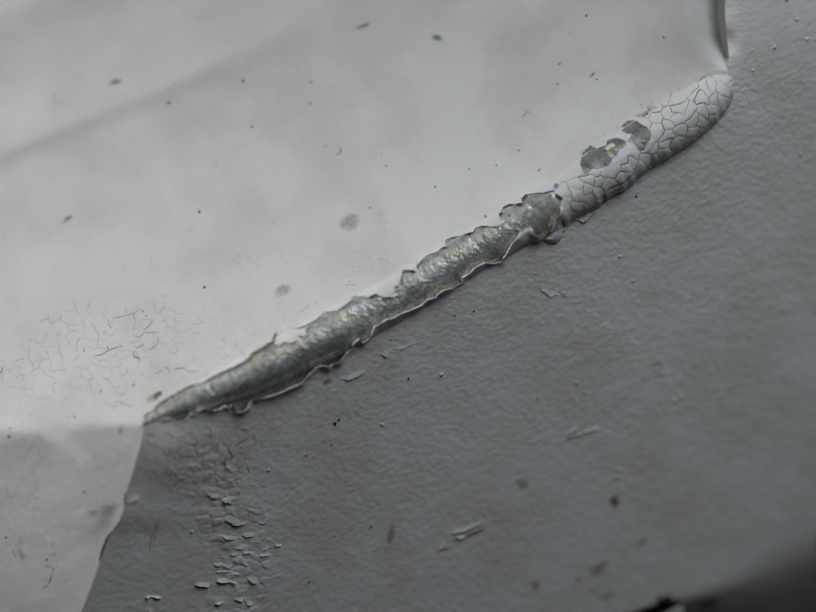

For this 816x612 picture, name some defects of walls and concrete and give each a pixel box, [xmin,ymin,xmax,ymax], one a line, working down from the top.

crack [561,73,732,212]
crack [0,302,202,408]
peeling [195,517,282,587]